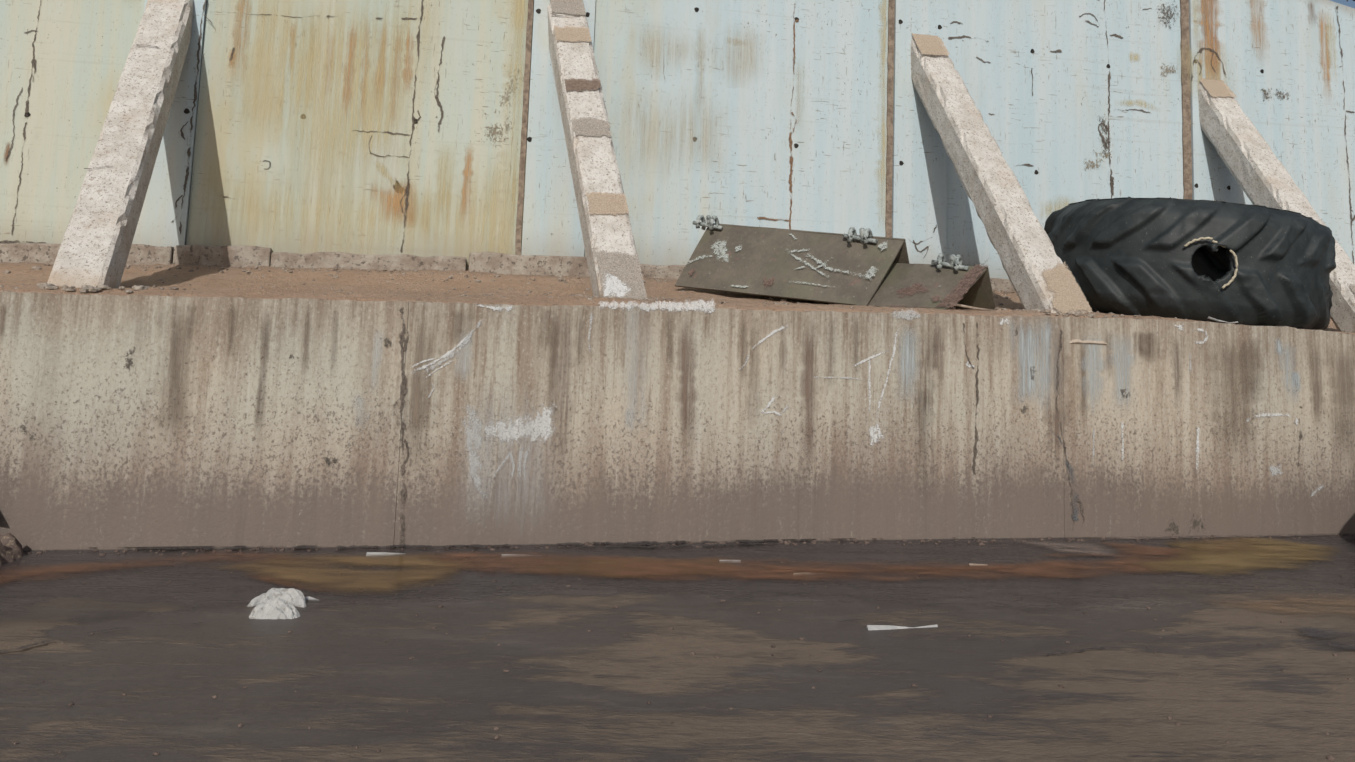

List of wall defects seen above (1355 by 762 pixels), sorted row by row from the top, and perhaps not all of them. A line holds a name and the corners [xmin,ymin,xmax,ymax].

rust [1198,0,1219,82]
water stain [410,304,503,430]
water stain [463,405,530,497]
crack [293,308,882,549]
water stain [668,338,693,424]
water stain [805,333,926,445]
crack [1056,330,1084,521]
water stain [1286,357,1354,440]
crack [89,544,246,552]
rust [242,538,1325,590]